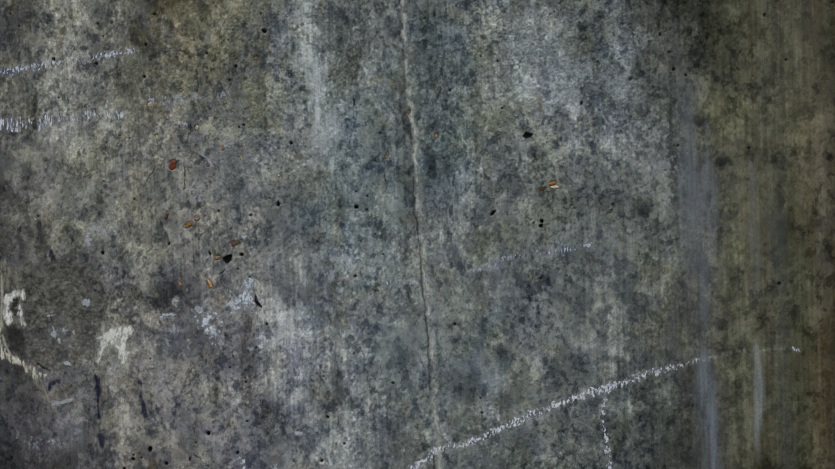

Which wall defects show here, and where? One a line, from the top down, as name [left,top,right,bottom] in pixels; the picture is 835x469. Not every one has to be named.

spalling [0,256,134,406]
water stain [699,352,716,469]
water stain [754,346,763,442]